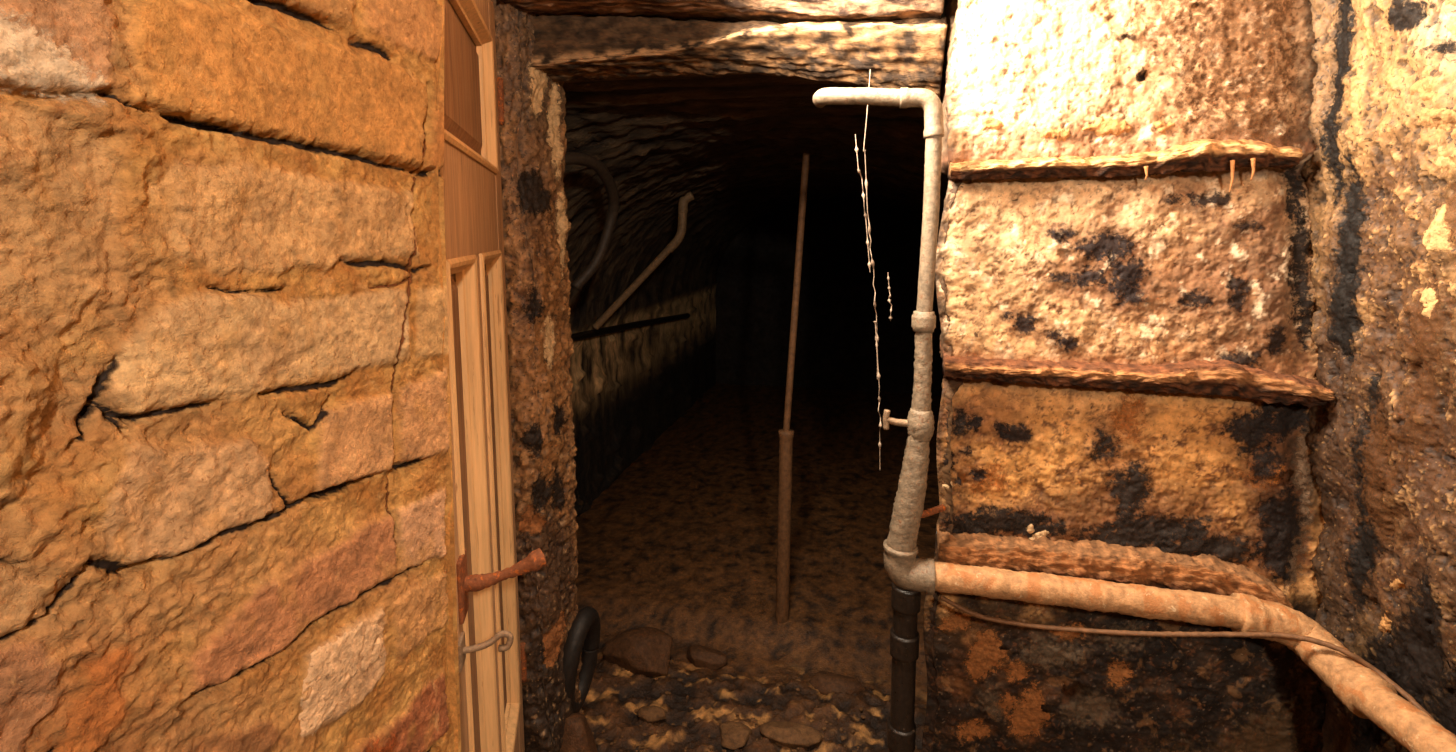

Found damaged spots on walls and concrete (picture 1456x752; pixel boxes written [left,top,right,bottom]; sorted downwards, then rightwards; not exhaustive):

crack [247,0,390,60]
damp [953,0,1048,137]
damp [1022,0,1092,95]
damp [1164,191,1231,208]
crack [339,227,427,390]
damp [1004,311,1078,352]
damp [1046,228,1151,306]
damp [1178,275,1252,313]
damp [941,402,1314,588]
crack [0,459,422,693]
damp [1021,634,1084,670]
damp [1060,686,1118,728]